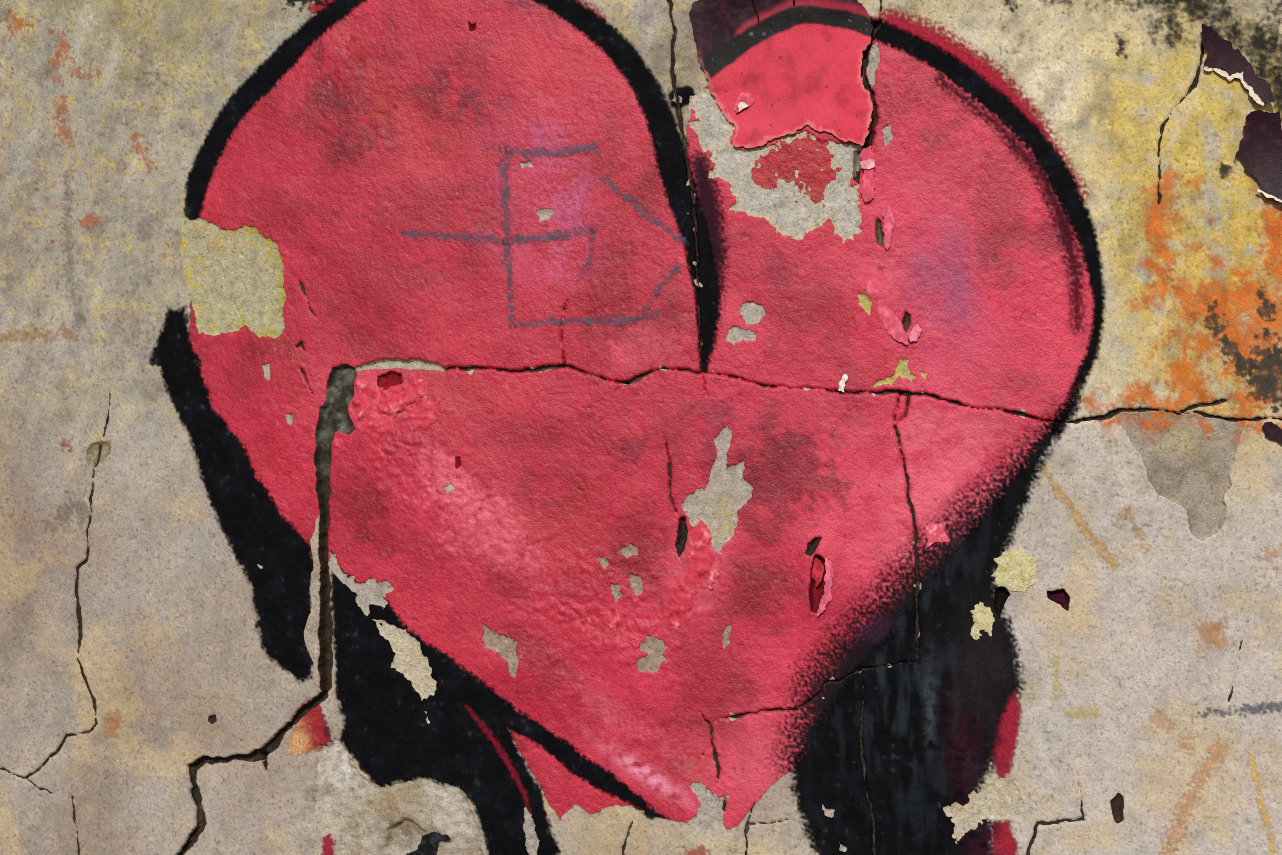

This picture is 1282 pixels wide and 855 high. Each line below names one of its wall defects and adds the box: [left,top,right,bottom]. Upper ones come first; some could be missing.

crack [666,0,703,287]
peeling [689,0,894,243]
leakage [1122,0,1282,121]
peeling [1201,23,1282,203]
peeling [179,217,286,338]
corrosion [1083,173,1282,433]
crack [0,391,113,855]
peeling [329,551,437,724]
peeling [633,425,753,673]
crack [178,304,1282,855]
hole [993,587,1010,620]